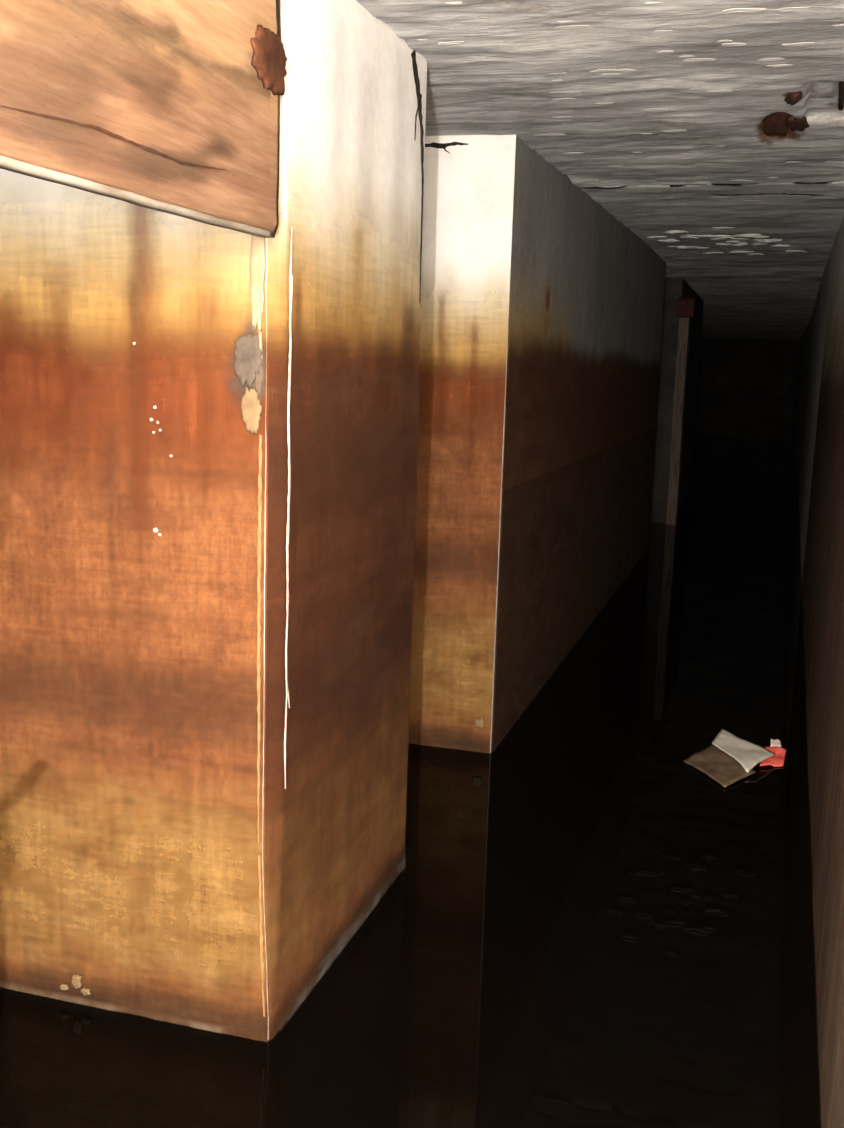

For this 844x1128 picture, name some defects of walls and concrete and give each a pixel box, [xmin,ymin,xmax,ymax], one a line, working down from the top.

spalling [231,235,266,1017]
leakage [801,332,844,1128]